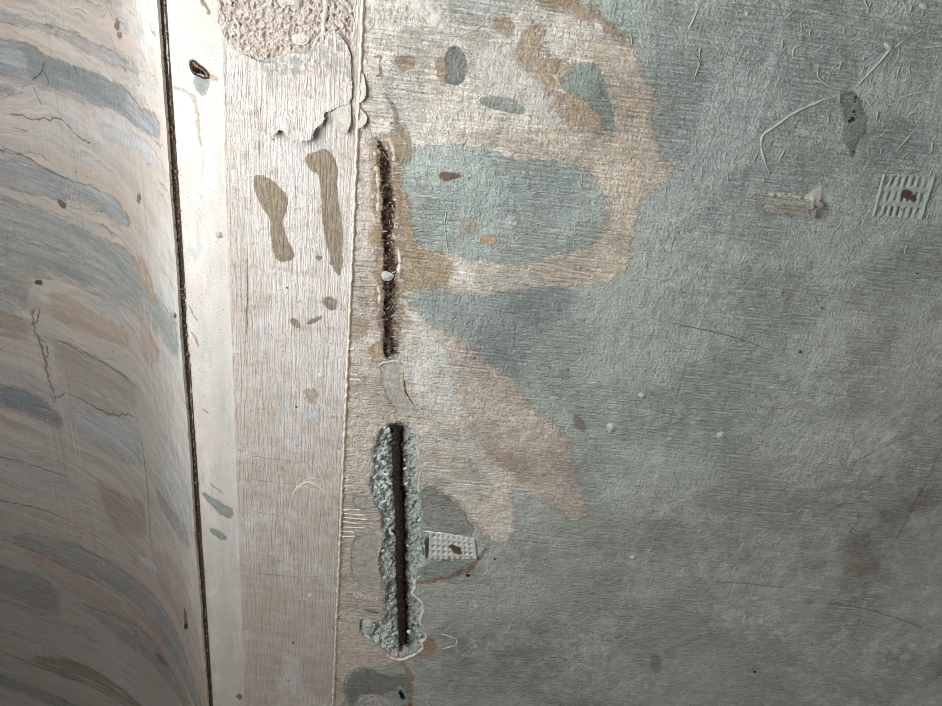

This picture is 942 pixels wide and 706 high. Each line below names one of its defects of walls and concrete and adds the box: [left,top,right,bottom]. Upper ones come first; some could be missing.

peeling [189,0,368,143]
rust [368,134,404,364]
spalling [350,421,436,661]